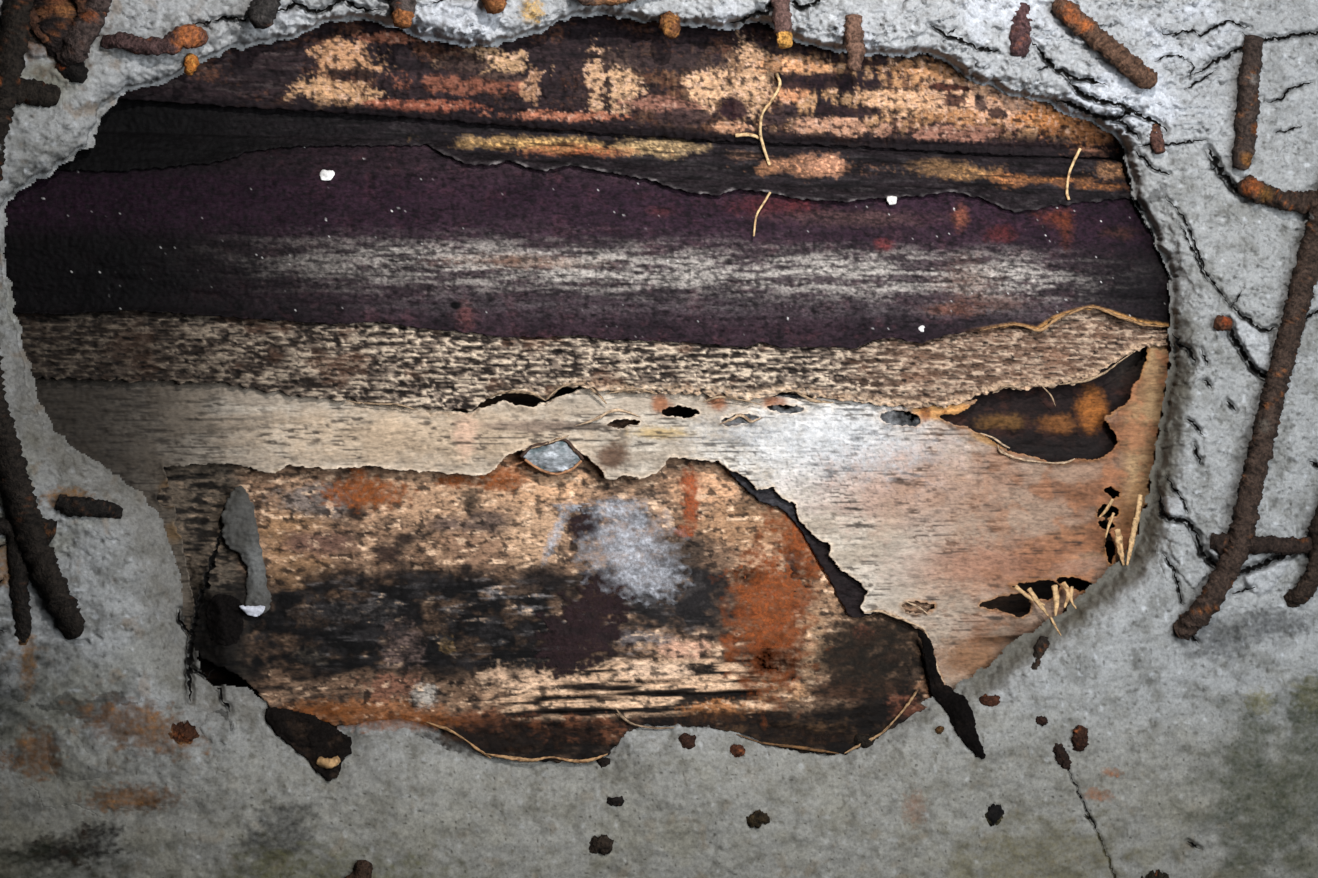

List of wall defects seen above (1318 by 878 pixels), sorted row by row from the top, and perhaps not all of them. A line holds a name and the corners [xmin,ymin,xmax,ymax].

corrosion [28,0,87,58]
corrosion [184,53,200,75]
crack [192,0,391,26]
spalling [0,0,775,181]
crack [730,0,820,24]
crack [929,24,1000,52]
crack [1154,20,1318,89]
crack [1031,41,1275,411]
spalling [790,0,1318,640]
crack [1158,475,1292,605]
peeling [239,605,265,617]
damp [255,503,726,679]